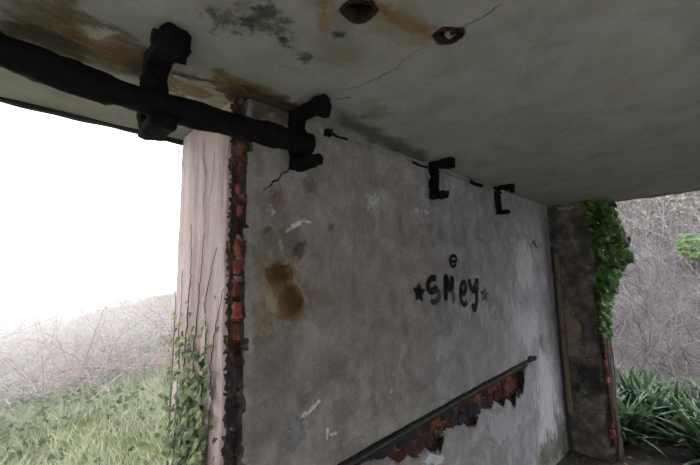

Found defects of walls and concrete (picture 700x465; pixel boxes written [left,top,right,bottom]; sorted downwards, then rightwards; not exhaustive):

leakage [207,0,312,64]
rust [340,0,465,45]
crack [264,167,289,194]
spalling [223,137,248,465]
spalling [365,370,525,464]